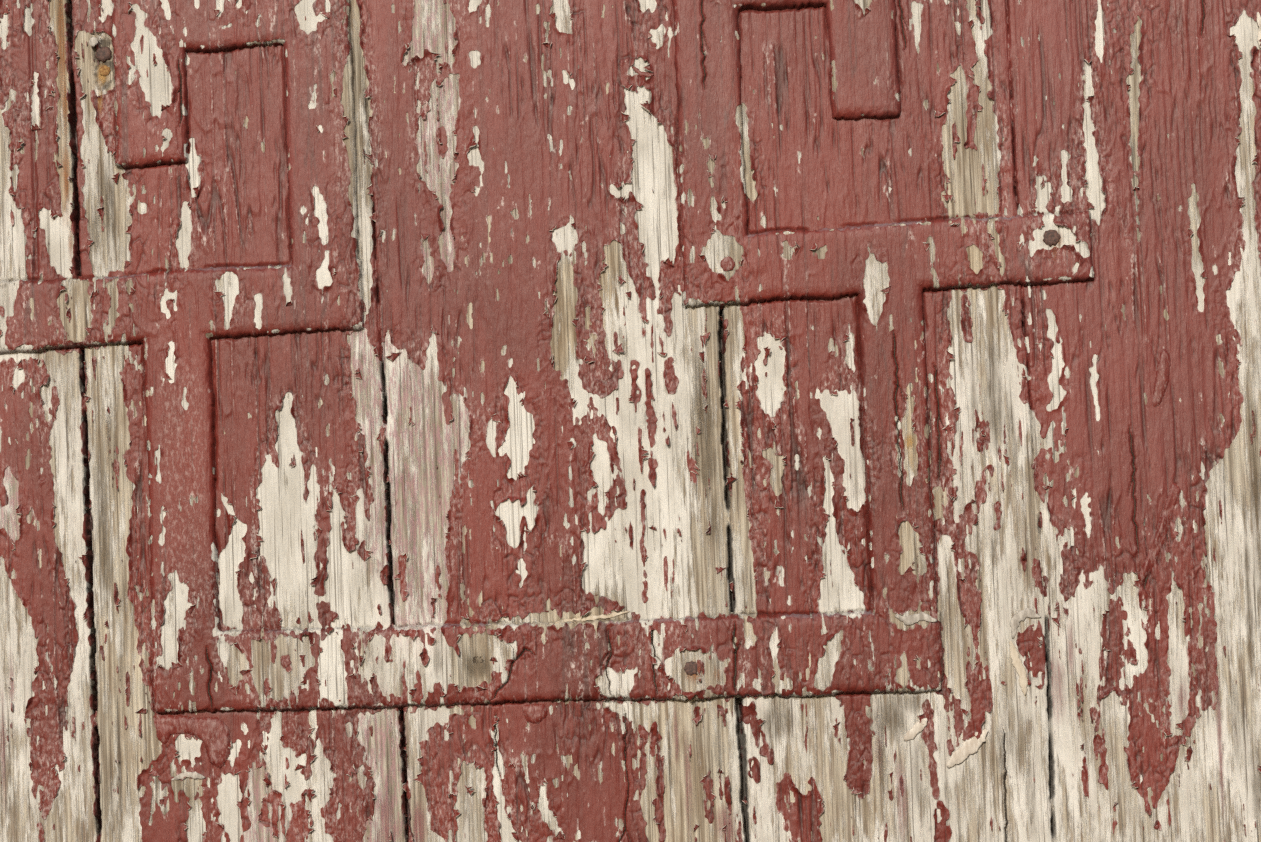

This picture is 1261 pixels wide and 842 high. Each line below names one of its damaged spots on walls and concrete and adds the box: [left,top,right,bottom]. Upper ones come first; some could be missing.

peeling [126,0,173,118]
peeling [524,0,579,99]
peeling [176,137,203,271]
peeling [205,267,251,338]
peeling [291,185,340,305]
peeling [384,0,513,283]
peeling [863,247,894,331]
peeling [923,0,1007,276]
peeling [1016,0,1116,281]
peeling [1178,183,1217,312]
peeling [486,343,538,588]
peeling [519,743,581,842]